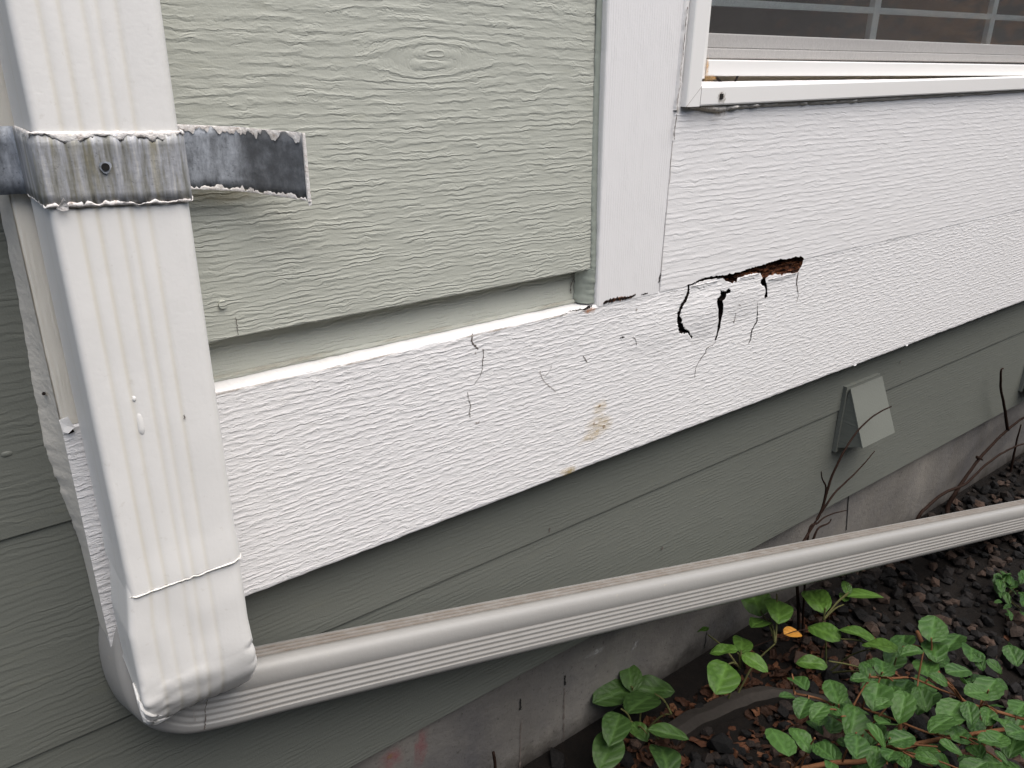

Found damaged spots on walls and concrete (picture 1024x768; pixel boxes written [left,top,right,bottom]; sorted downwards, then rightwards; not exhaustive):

crack [677,275,723,372]